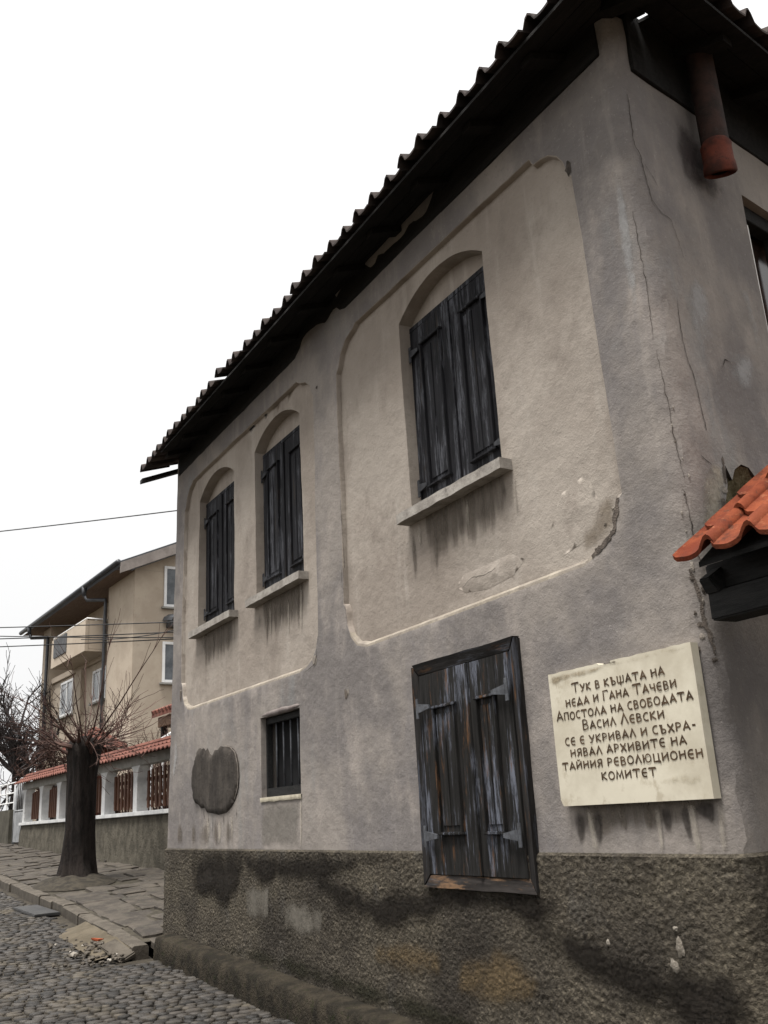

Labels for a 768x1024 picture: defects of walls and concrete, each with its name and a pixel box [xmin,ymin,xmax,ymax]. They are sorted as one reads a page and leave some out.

crack [627,95,712,560]
water stain [413,481,517,569]
spalling [588,497,619,558]
water stain [263,582,303,634]
water stain [204,620,232,662]
water stain [576,799,724,849]
water stain [196,854,438,925]